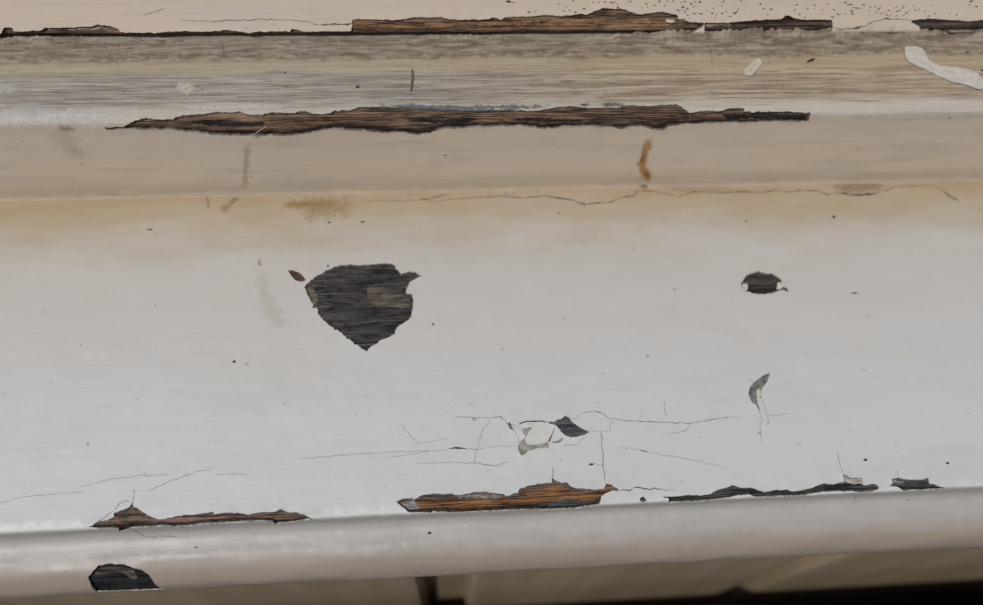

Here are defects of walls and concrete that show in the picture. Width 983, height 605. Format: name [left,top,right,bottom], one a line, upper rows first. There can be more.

peeling [1,0,983,35]
peeling [112,105,810,135]
corrosion [638,141,651,188]
crack [363,185,958,206]
peeling [741,272,788,294]
peeling [288,264,420,351]
peeling [748,374,778,442]
crack [303,423,511,466]
peeling [397,453,878,512]
peeling [890,471,942,490]
peeling [89,500,310,538]
peeling [89,563,158,590]